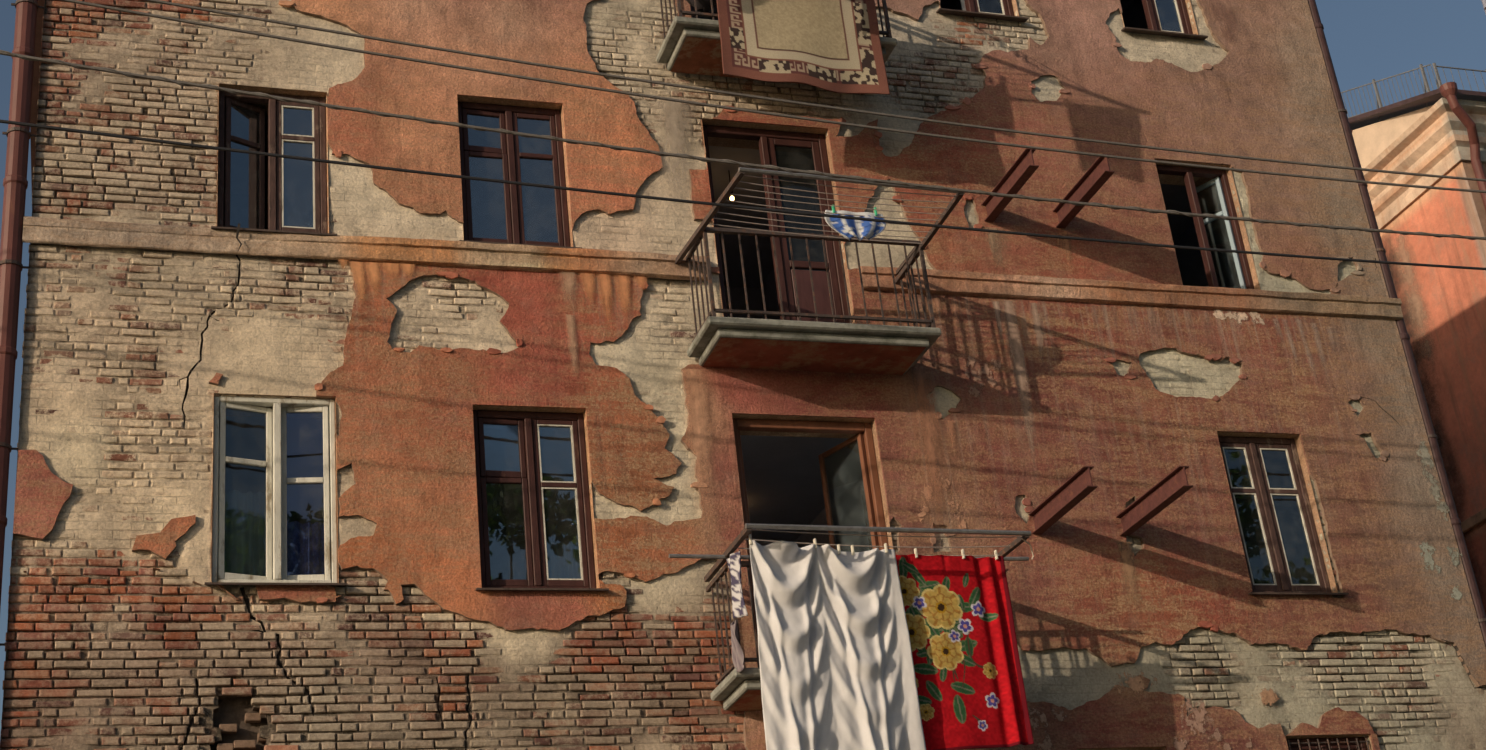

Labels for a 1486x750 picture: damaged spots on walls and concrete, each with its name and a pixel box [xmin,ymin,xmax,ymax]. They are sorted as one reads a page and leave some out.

spalling [32,0,365,228]
spalling [1029,76,1070,102]
spalling [327,146,464,241]
crack [179,223,242,429]
spalling [570,0,1048,525]
spalling [1105,349,1247,402]
water stain [1385,236,1463,514]
spalling [0,243,746,750]
crack [180,678,209,750]
crack [240,587,314,716]
spalling [990,620,1486,750]